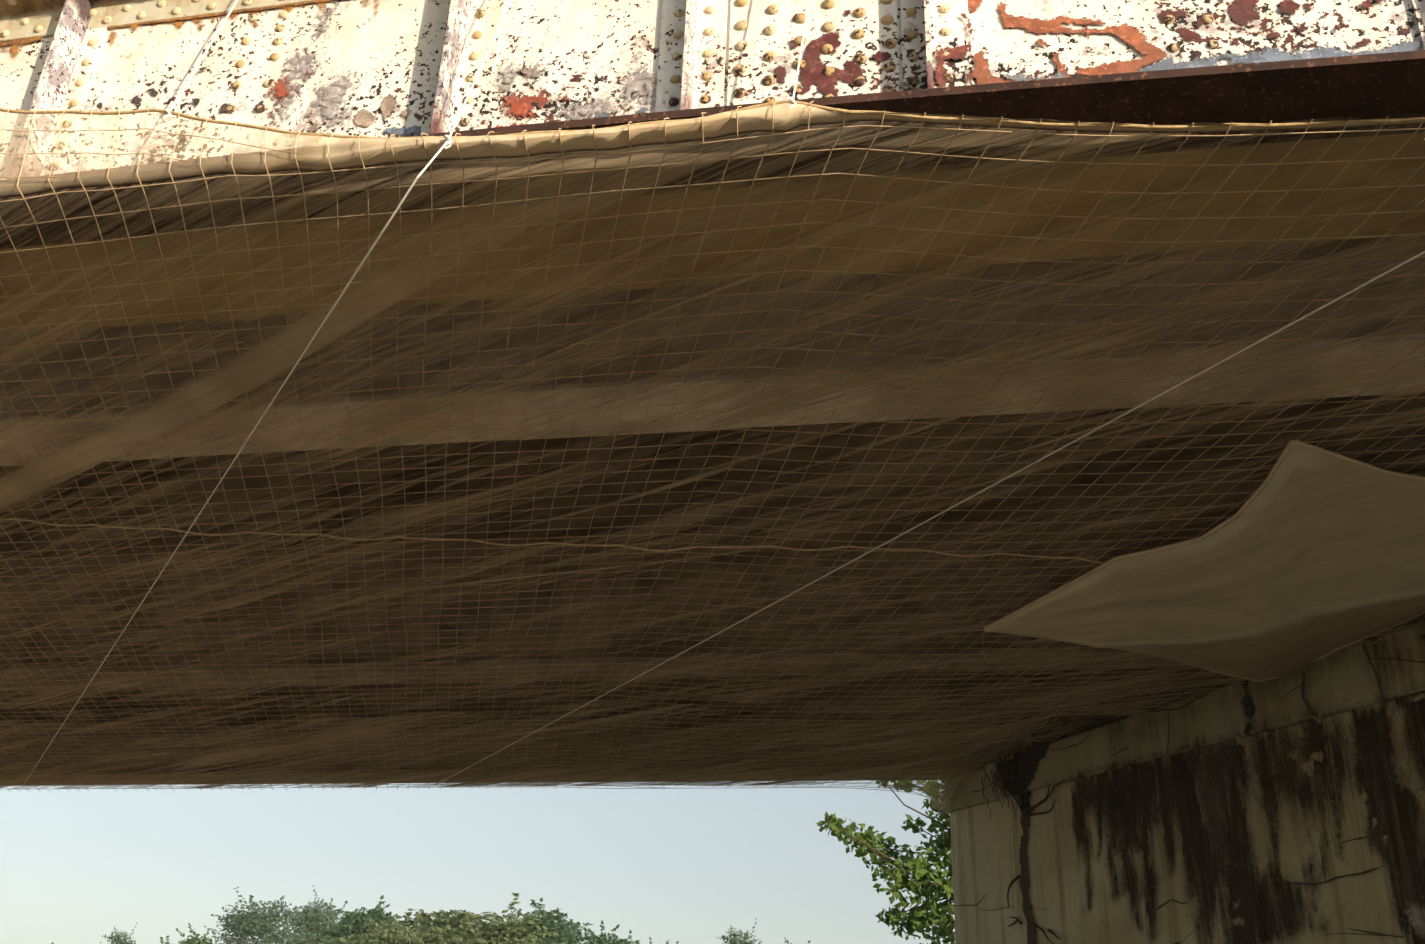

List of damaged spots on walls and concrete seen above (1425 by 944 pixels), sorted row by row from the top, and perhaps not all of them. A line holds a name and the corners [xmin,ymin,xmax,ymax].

peeling [131,79,165,104]
peeling [253,0,422,136]
peeling [489,55,657,128]
peeling [933,0,1423,87]
crack [948,799,1048,944]
damp [1072,691,1425,944]